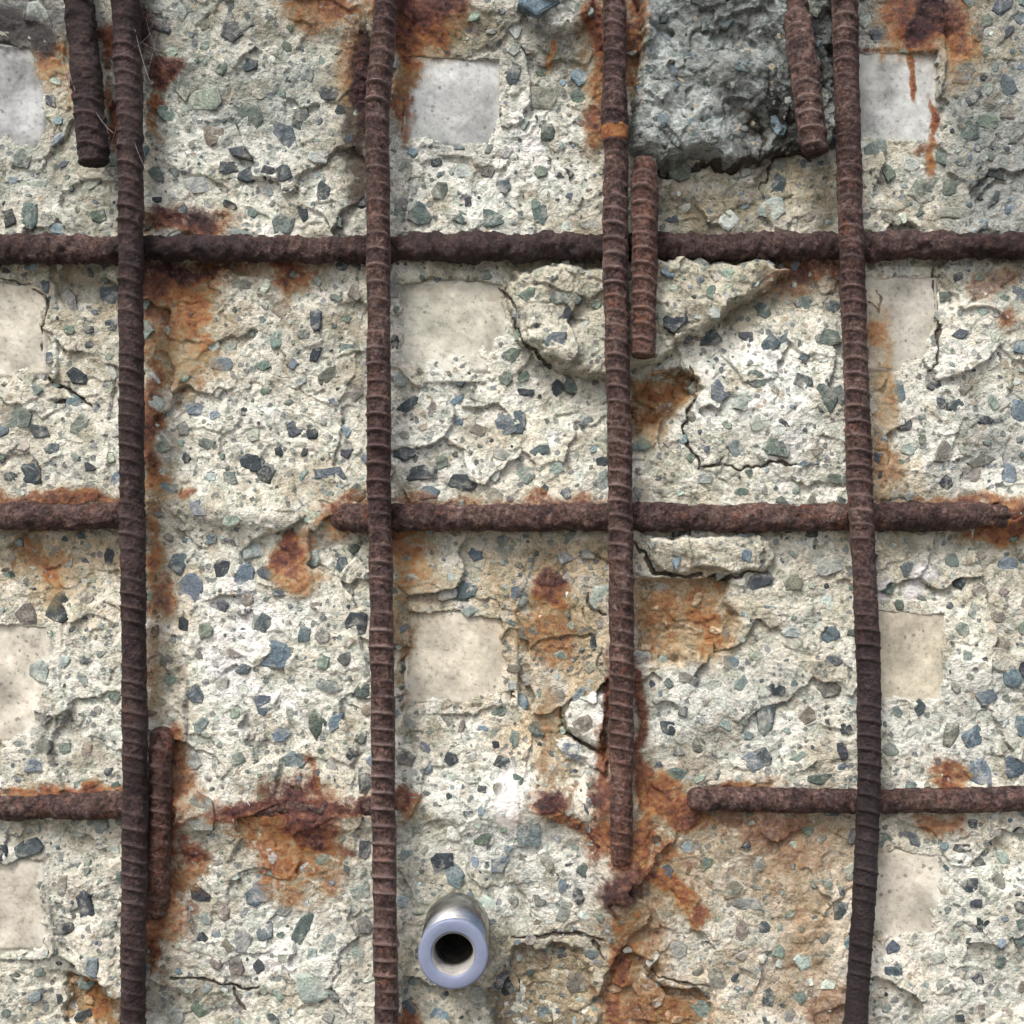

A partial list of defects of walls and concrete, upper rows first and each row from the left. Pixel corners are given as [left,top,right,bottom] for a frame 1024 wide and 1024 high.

rust [862,0,982,101]
rust [143,261,230,618]
rust [146,724,371,976]
spalling [143,261,375,1024]
spalling [390,260,608,505]
crack [498,287,551,369]
crack [559,706,601,753]
spalling [393,530,856,1024]
rust [529,651,810,1024]
crack [634,542,768,581]
spalling [630,257,846,505]
crack [681,366,798,472]